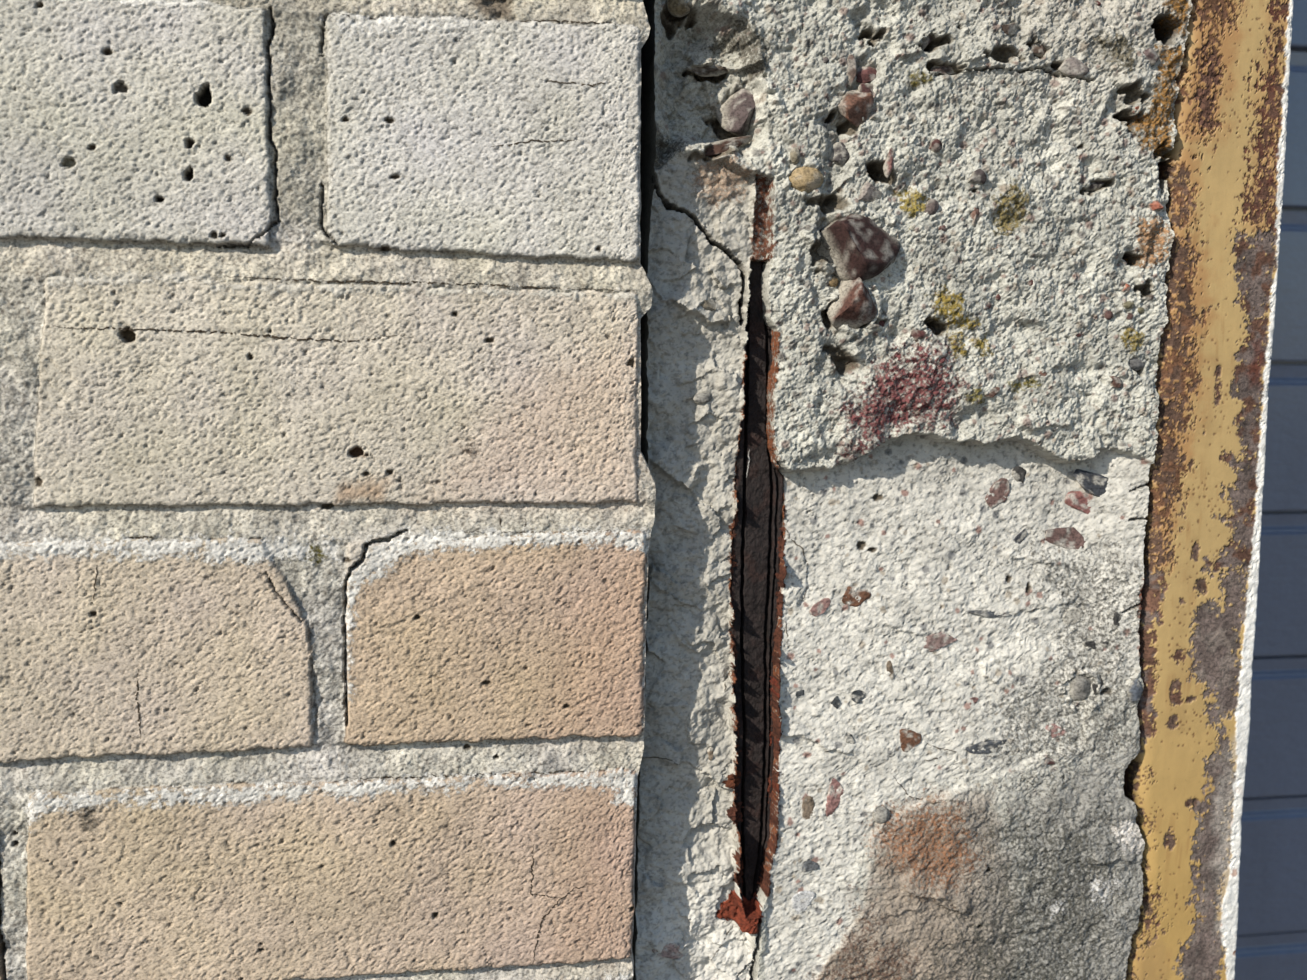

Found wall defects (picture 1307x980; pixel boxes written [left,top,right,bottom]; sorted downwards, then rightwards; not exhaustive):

corrosion [1126,0,1191,159]
crack [651,172,749,325]
corrosion [692,152,778,262]
corrosion [1126,216,1172,268]
spalling [635,0,1290,980]
corrosion [716,330,788,935]
water stain [806,538,1145,980]
crack [711,922,761,980]